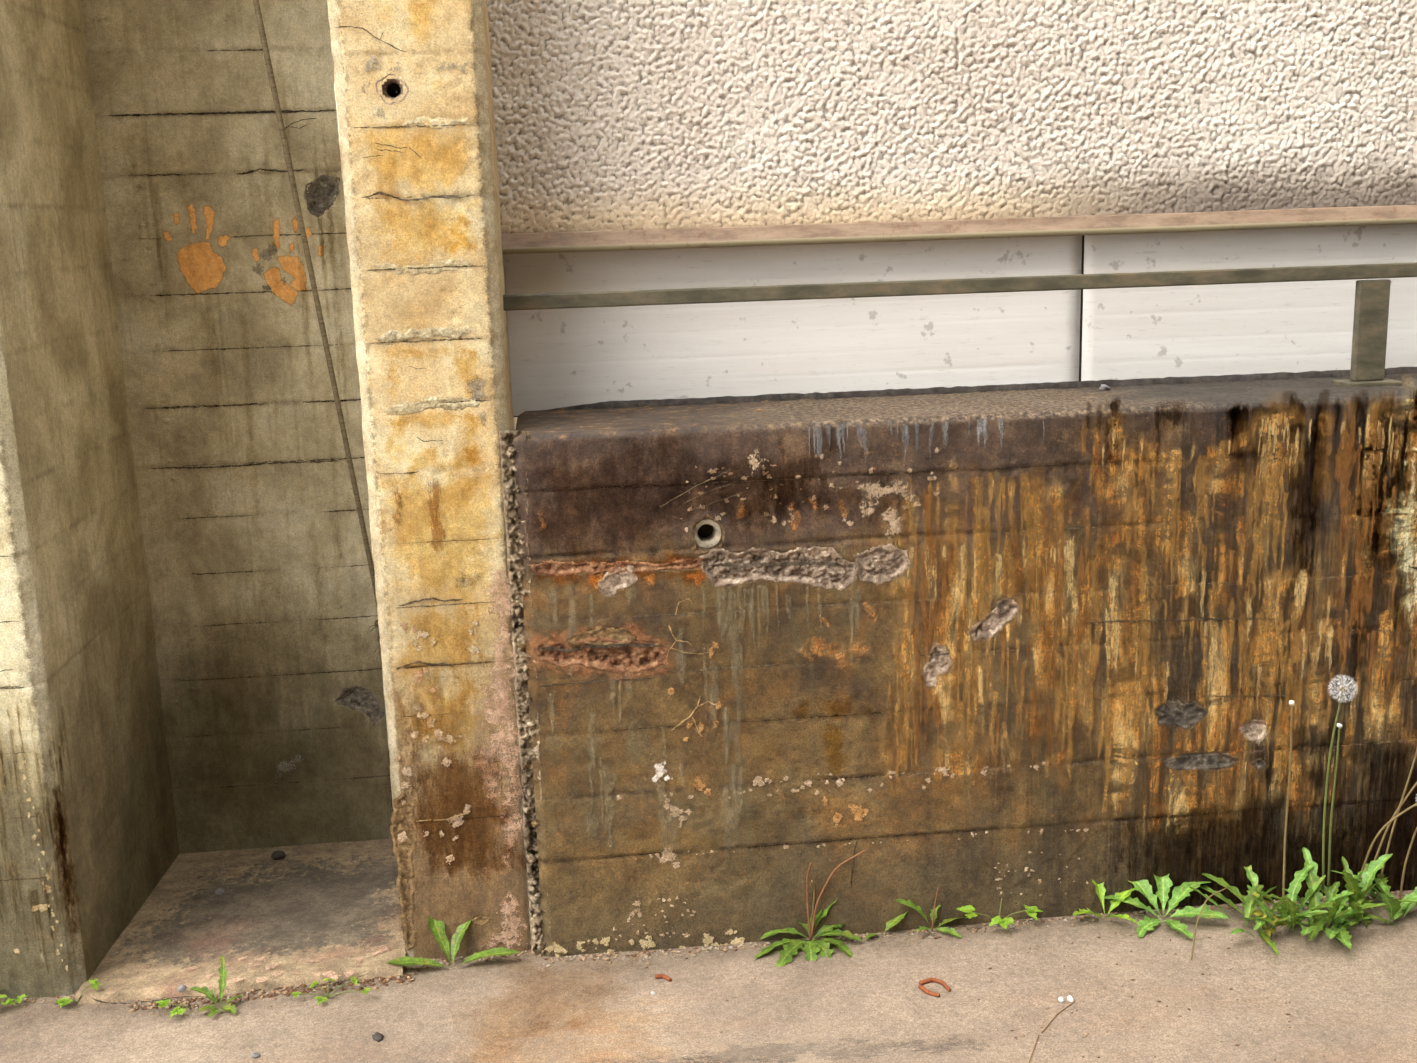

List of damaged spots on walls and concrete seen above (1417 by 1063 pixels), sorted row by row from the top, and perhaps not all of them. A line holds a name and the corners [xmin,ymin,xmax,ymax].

spalling [304,174,340,217]
water stain [1087,399,1118,452]
corrosion [429,481,445,551]
water stain [1176,390,1417,720]
spalling [231,378,939,983]
corrosion [528,622,676,683]
corrosion [800,618,871,668]
spalling [923,641,954,687]
spalling [968,598,1021,641]
water stain [1105,576,1170,713]
peeling [922,767,955,790]